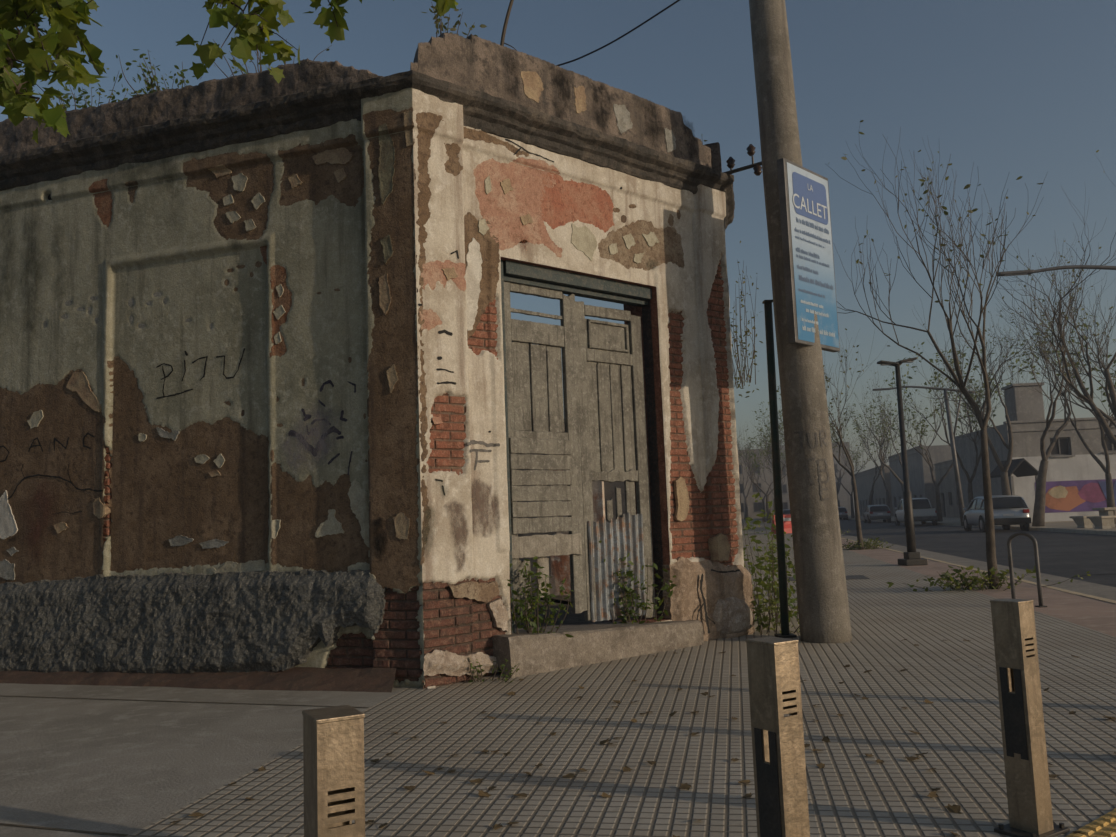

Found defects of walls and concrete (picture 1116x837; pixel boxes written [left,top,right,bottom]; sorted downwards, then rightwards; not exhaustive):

flaking render [574,86,587,113]
flaking render [0,104,685,689]
spalling [667,261,739,566]